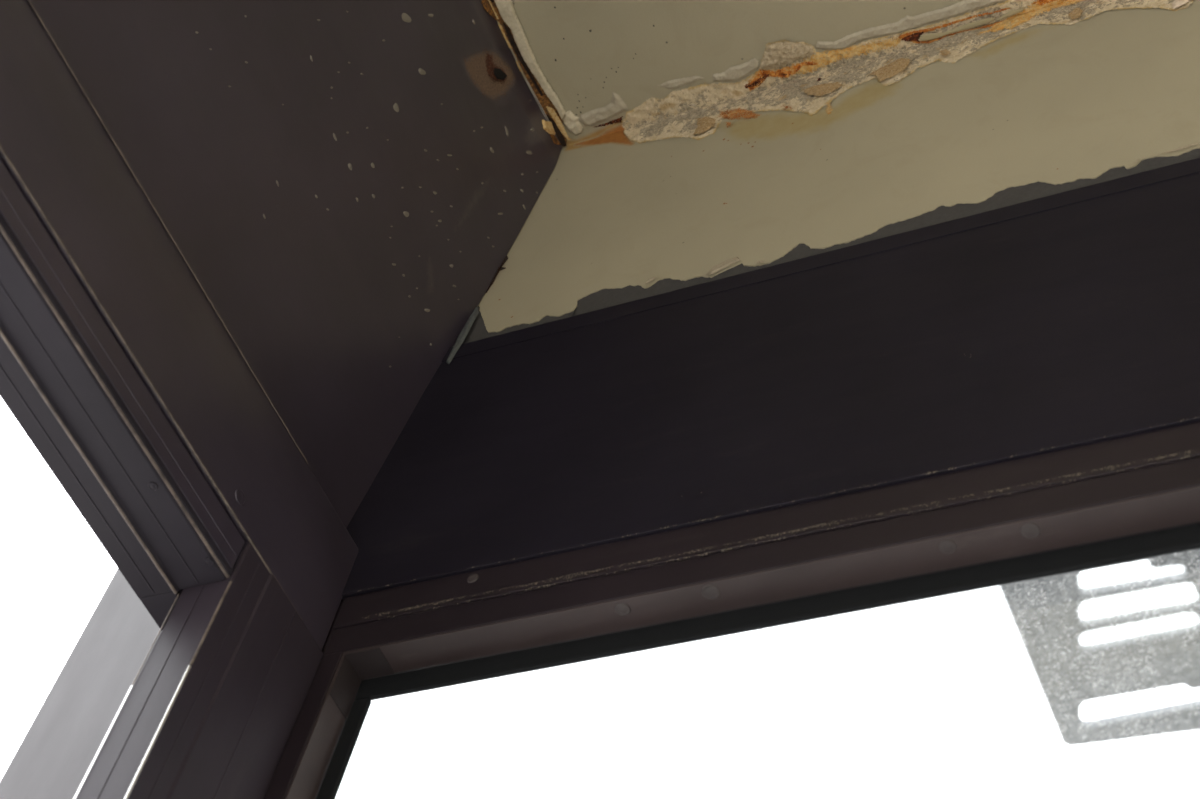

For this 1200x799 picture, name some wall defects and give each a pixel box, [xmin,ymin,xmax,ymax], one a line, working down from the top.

corrosion [458,0,636,153]
corrosion [717,108,761,147]
spalling [494,0,1193,144]
corrosion [745,0,1085,92]